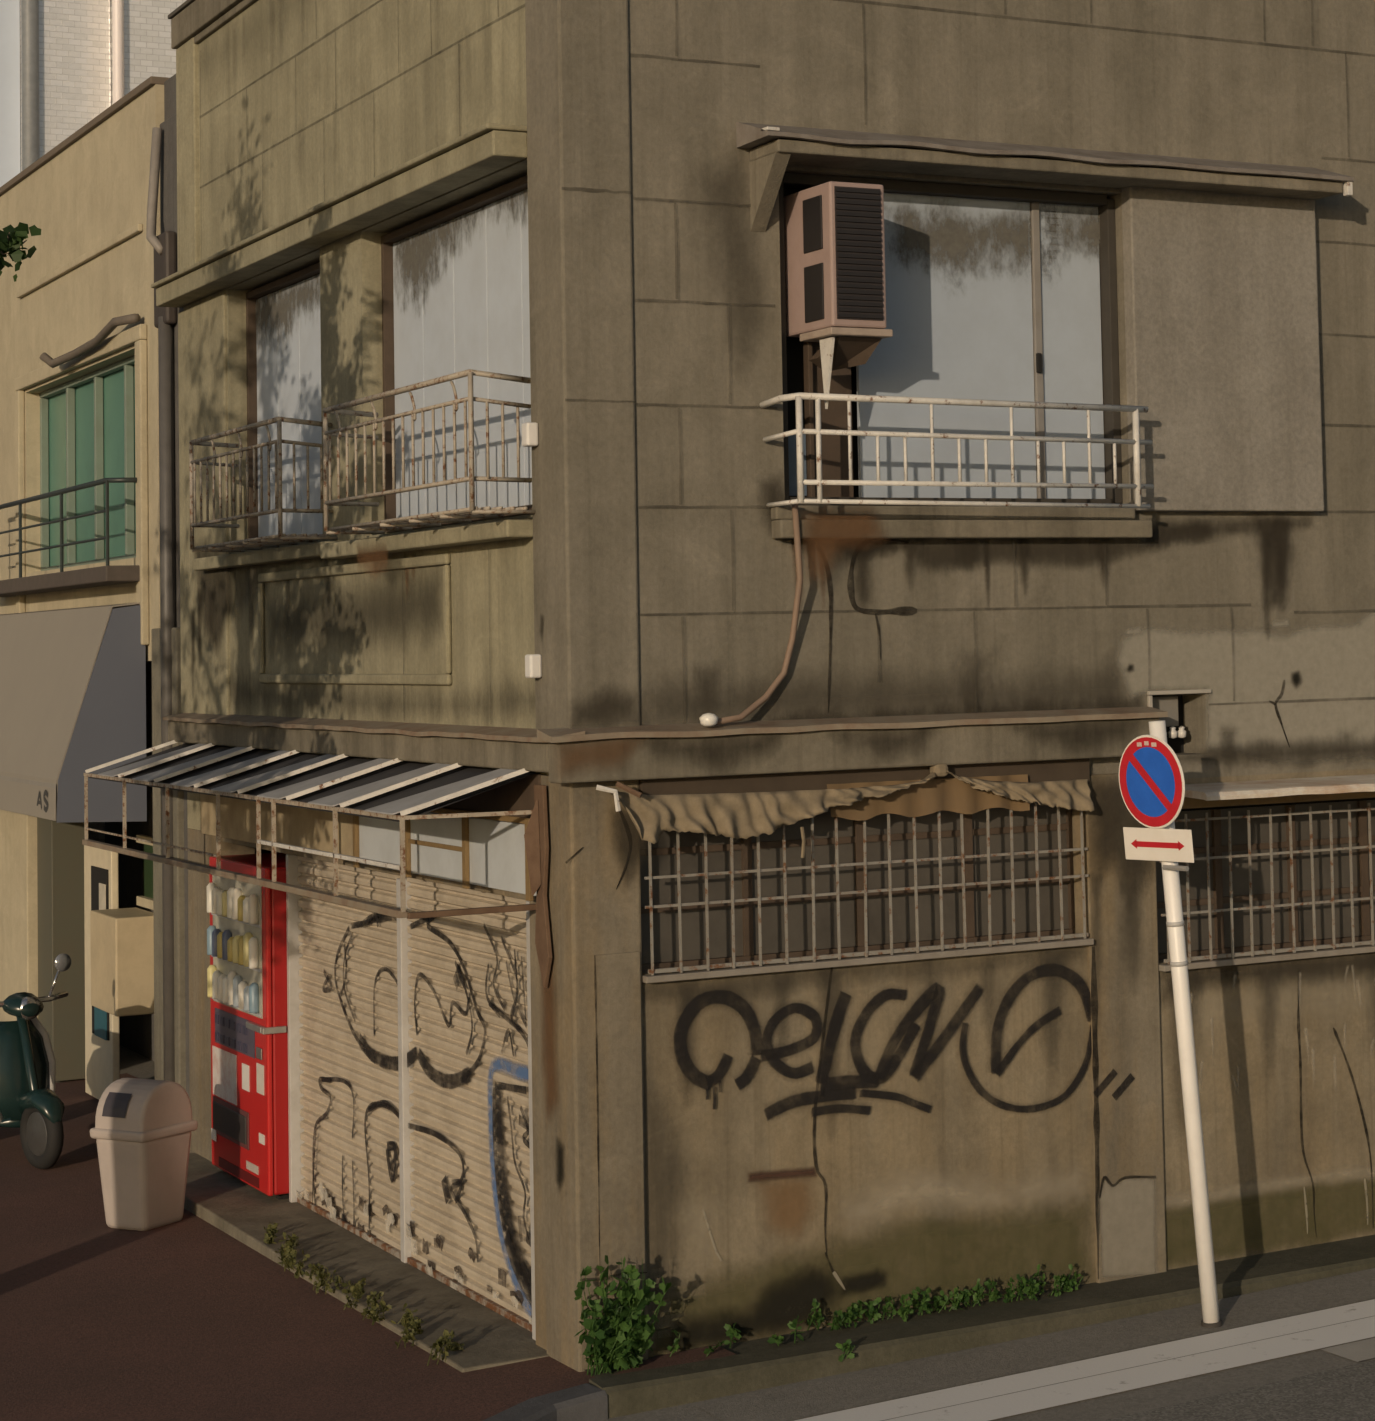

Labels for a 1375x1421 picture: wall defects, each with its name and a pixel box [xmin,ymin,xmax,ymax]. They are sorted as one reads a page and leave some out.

leakage [834,520,1289,602]
leakage [192,552,231,661]
leakage [277,587,437,634]
crack [1297,971,1374,1237]
leakage [672,1271,885,1347]